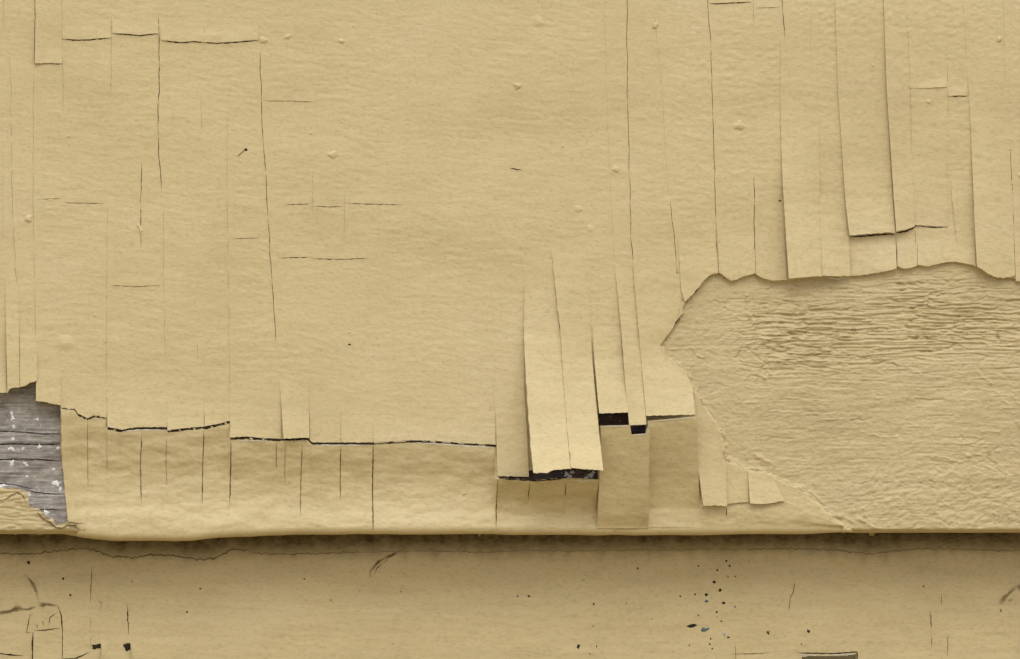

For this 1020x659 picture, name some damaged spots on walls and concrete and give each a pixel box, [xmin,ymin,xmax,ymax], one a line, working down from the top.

crack [34,0,284,342]
peeling [0,233,787,534]
crack [623,0,642,278]
crack [667,201,690,299]
crack [704,0,751,273]
crack [750,175,764,269]
peeling [661,0,1020,533]
crack [909,77,967,97]